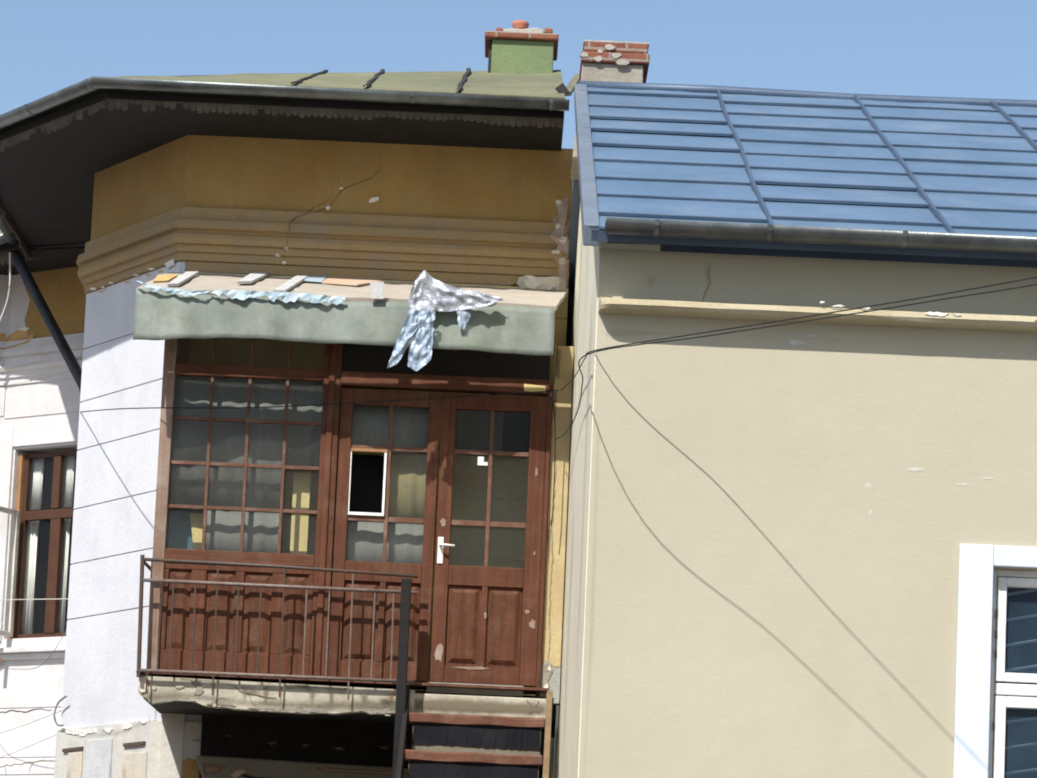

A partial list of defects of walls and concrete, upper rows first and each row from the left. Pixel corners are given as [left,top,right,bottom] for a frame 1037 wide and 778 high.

spalling [549,197,570,289]
flaking render [0,259,175,349]
spalling [148,679,337,714]
spalling [360,708,395,716]